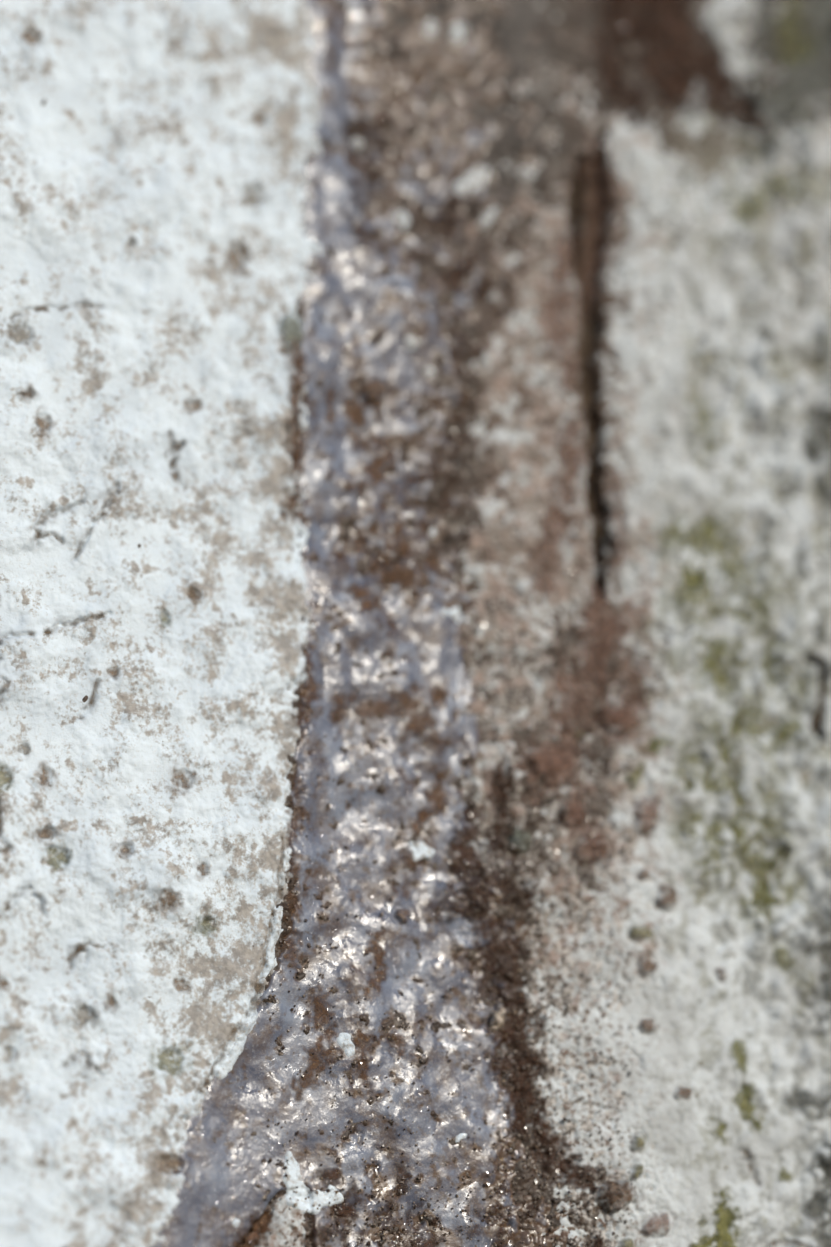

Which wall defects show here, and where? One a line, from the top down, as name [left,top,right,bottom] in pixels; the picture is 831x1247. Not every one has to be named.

rust [595,0,766,131]
rust [407,176,512,299]
water stain [627,738,673,790]
rust [435,763,612,1199]
rust [304,1168,362,1247]
rust [378,1146,410,1192]
rust [407,1218,443,1247]
rust [472,1207,504,1247]